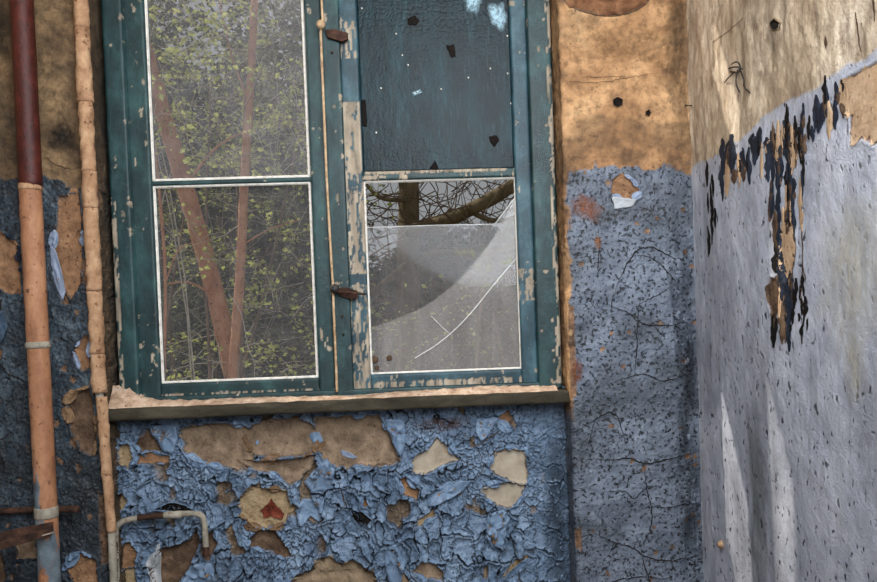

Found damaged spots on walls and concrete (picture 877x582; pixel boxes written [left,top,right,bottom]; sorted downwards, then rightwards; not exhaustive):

flaking render [0,231,22,294]
flaking render [47,188,84,302]
flaking render [611,173,642,209]
crack [609,246,689,382]
peeling [705,63,877,352]
peeling [476,409,512,441]
flaking render [118,411,470,560]
flaking render [479,445,533,550]
crack [577,412,698,582]
flaking render [61,551,98,582]
flaking render [121,524,218,582]
flaking render [273,544,445,582]